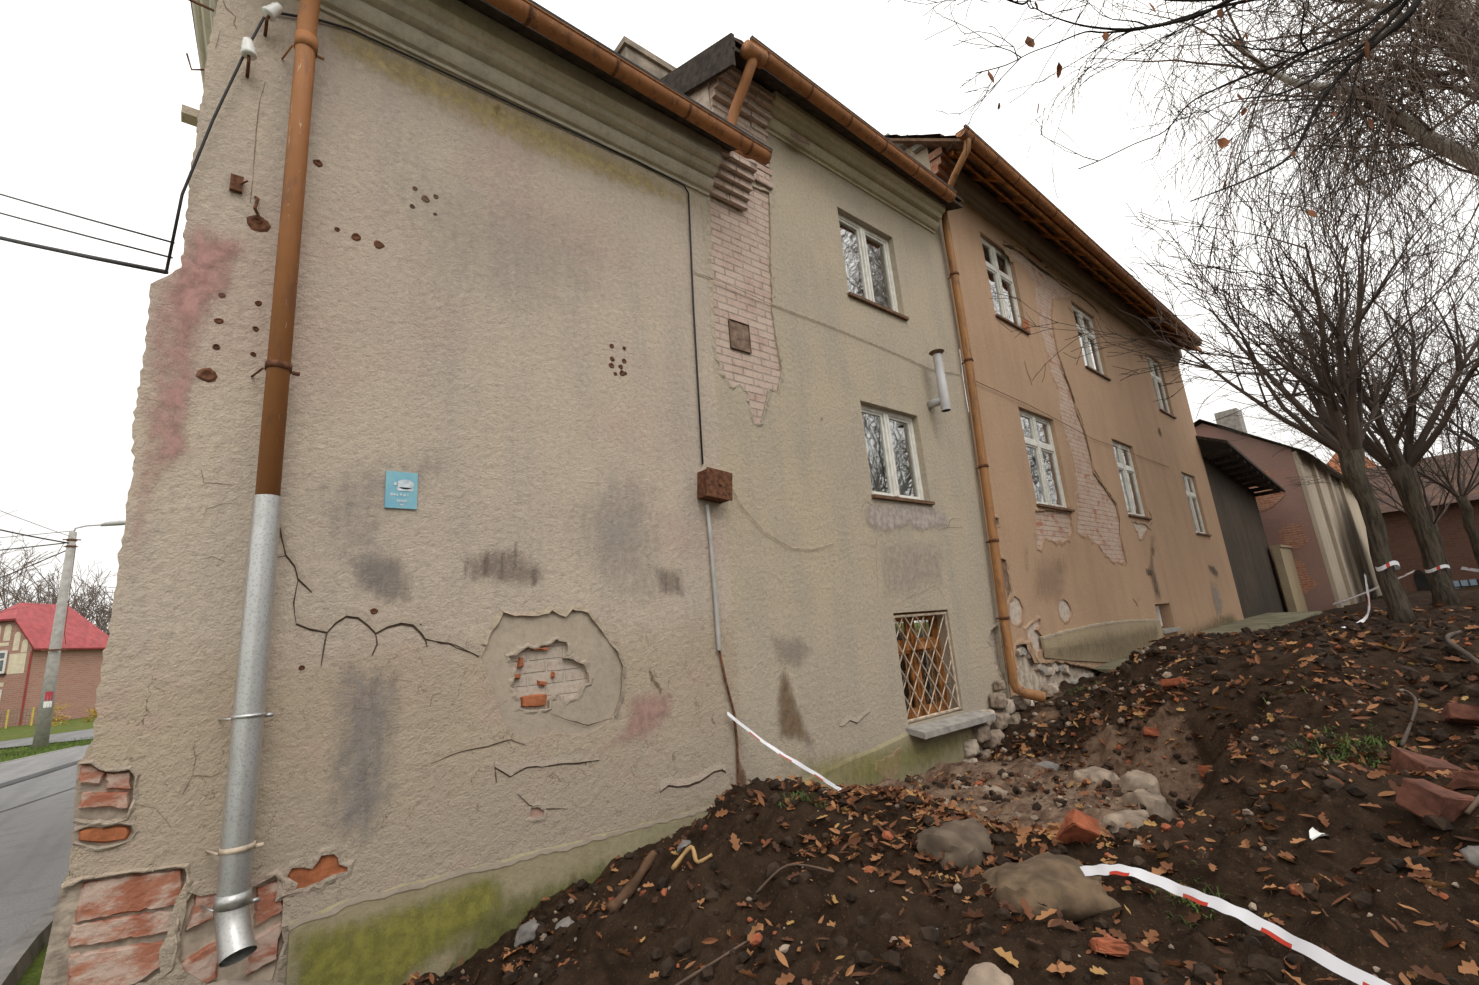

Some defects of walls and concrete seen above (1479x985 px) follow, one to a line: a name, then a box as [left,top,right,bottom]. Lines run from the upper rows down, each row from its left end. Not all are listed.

spalling [705,183,785,427]
spalling [999,241,1148,567]
crack [1024,361,1153,563]
spalling [71,760,141,853]
crack [280,523,479,705]
crack [431,701,612,810]
peeling [480,604,627,739]
water stain [779,674,807,737]
spalling [40,842,356,985]